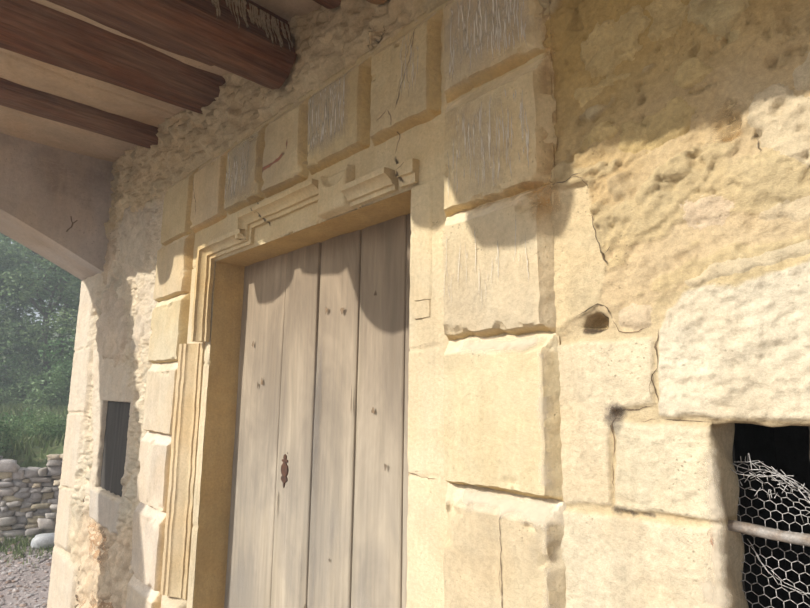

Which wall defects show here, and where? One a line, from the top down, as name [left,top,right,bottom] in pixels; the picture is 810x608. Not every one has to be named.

crack [377,24,420,182]
crack [592,216,610,263]
water stain [605,406,624,426]
crack [579,303,703,494]
crack [497,515,505,608]